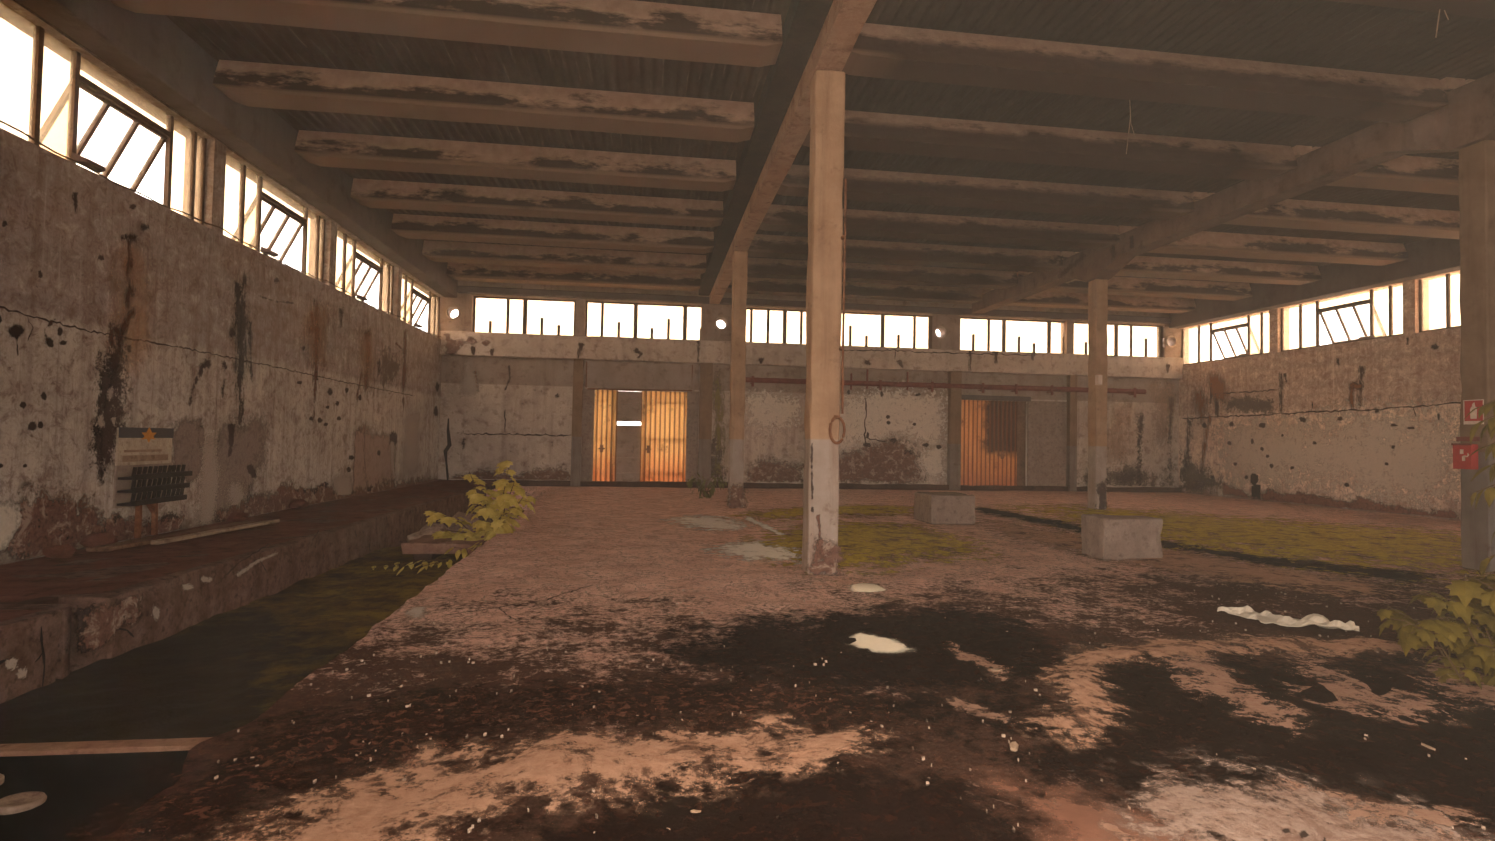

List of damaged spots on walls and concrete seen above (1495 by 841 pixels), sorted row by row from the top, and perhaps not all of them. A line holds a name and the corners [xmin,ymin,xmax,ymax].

water stain [88,328,131,484]
crack [0,306,415,396]
water stain [189,282,253,457]
crack [443,411,569,480]